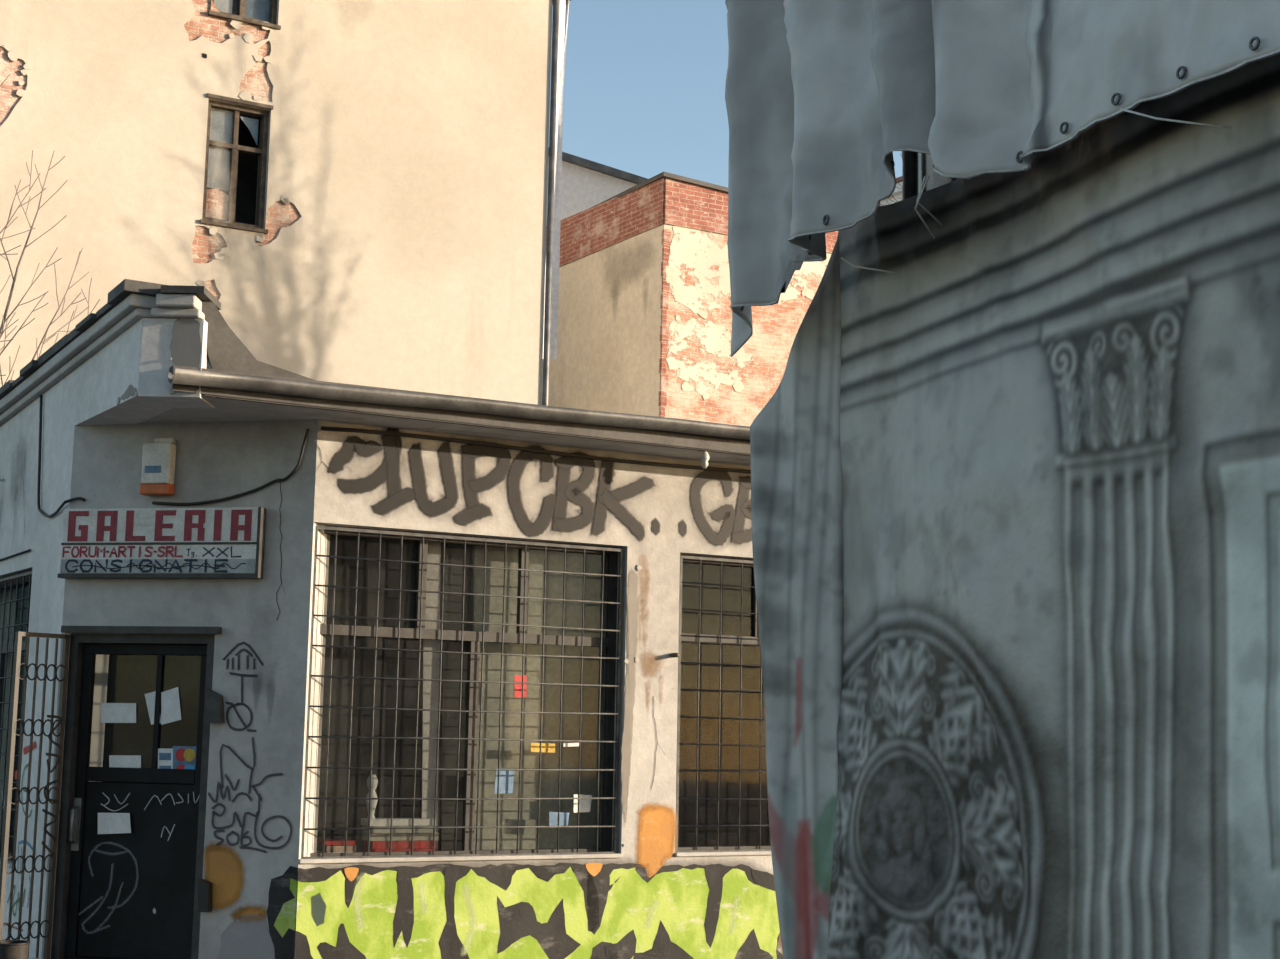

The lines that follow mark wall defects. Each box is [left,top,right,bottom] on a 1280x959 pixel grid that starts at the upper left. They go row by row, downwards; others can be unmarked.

flaking render [184,0,273,102]
flaking render [0,47,31,126]
flaking render [192,226,232,264]
flaking render [255,195,301,246]
flaking render [197,280,225,316]
flaking render [665,226,756,400]
flaking render [778,253,831,305]